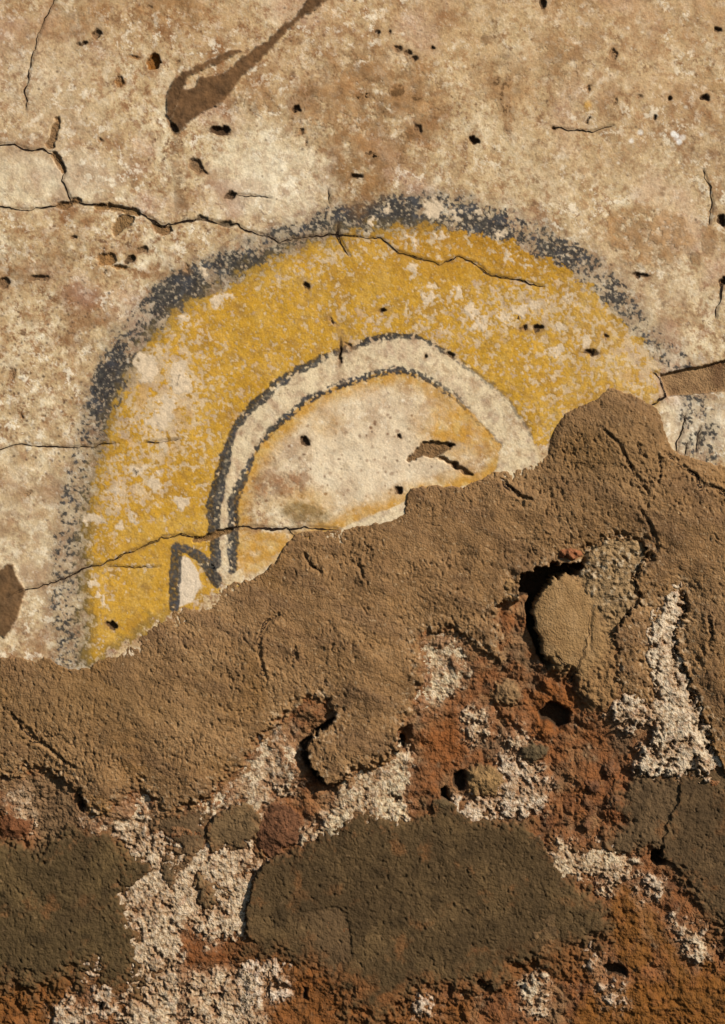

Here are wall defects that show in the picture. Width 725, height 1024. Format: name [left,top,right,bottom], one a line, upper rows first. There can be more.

crack [24,0,55,108]
crack [0,144,543,287]
peeling [133,353,197,453]
peeling [82,511,139,530]
peeling [129,464,190,511]
spalling [407,441,473,476]
crack [13,525,337,594]
flaking render [518,538,647,714]
spalling [538,701,569,727]
spalling [299,717,335,785]
spalling [440,769,466,797]
spalling [603,963,627,978]